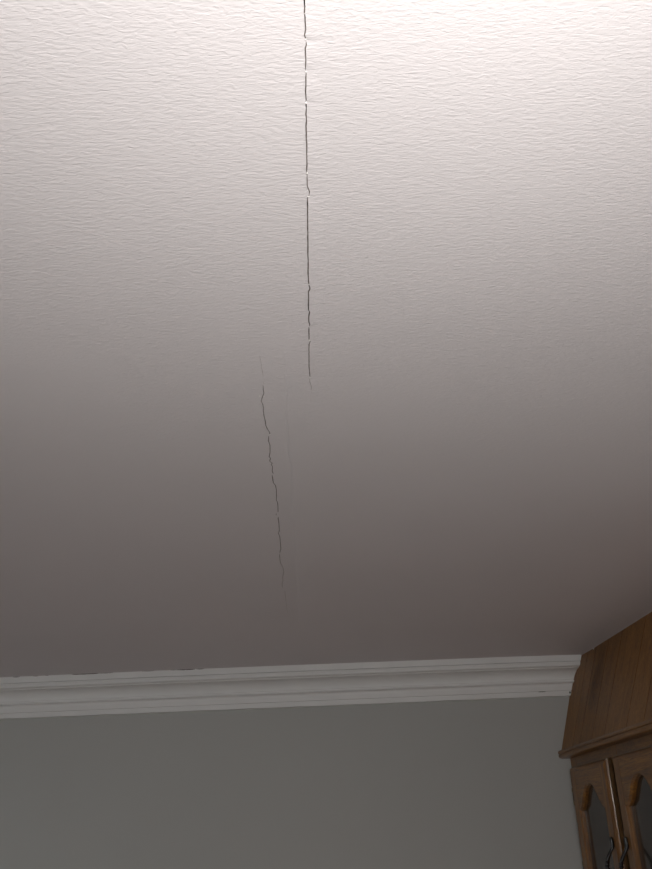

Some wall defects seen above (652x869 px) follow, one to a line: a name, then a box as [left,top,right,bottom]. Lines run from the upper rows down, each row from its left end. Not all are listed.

crack [304,0,328,406]